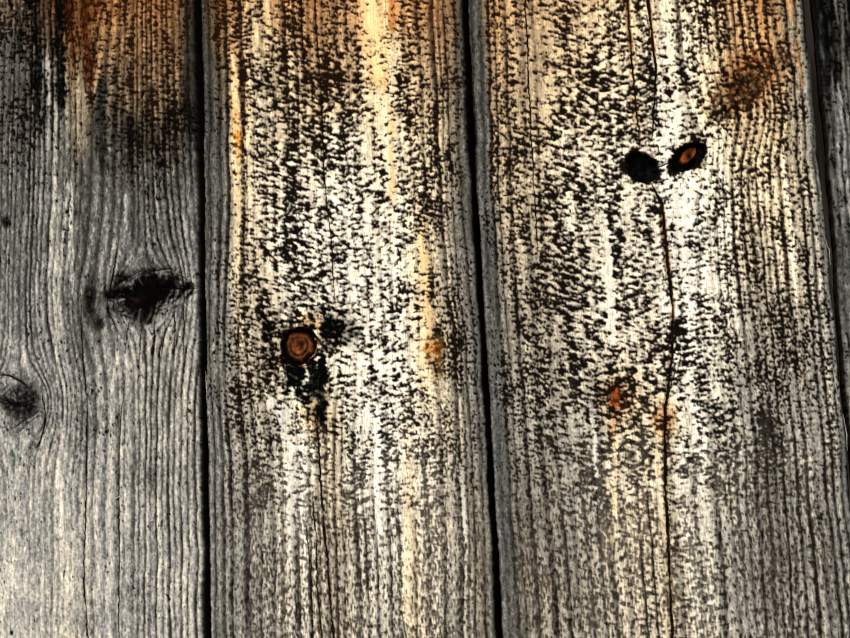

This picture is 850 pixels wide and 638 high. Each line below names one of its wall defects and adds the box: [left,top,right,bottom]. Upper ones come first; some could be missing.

crack [626,0,657,148]
crack [649,161,676,638]